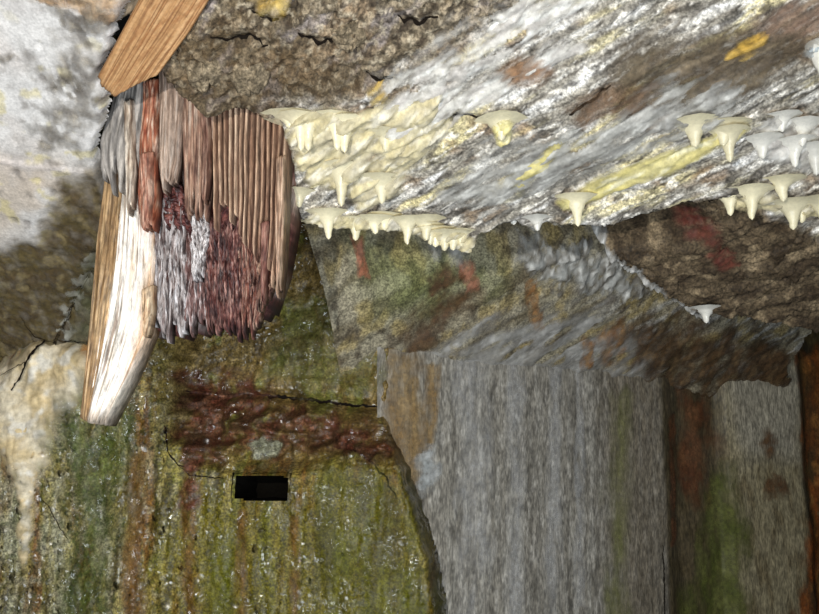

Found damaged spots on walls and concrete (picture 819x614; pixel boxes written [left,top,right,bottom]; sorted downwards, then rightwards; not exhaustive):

leakage [38,0,116,48]
crack [210,10,286,47]
crack [298,33,333,46]
crack [398,15,438,26]
leakage [40,55,102,150]
leakage [261,0,819,258]
crack [0,263,94,391]
leakage [405,268,479,353]
leakage [437,214,792,397]
rust [796,347,819,614]